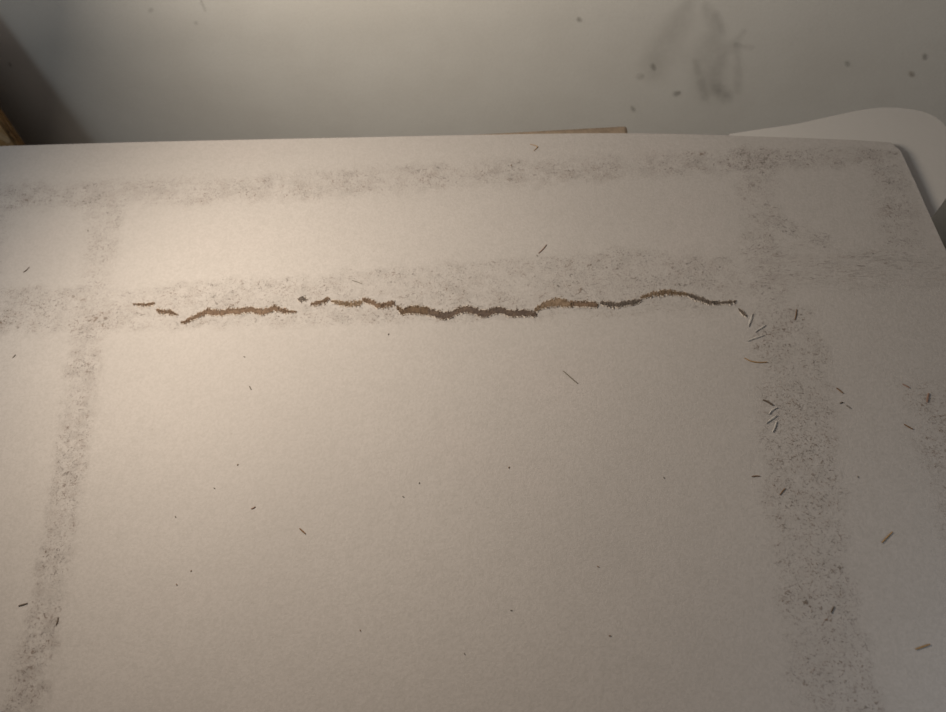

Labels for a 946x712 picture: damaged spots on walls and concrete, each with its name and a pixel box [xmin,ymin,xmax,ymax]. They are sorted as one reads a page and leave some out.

crack [133,289,747,325]